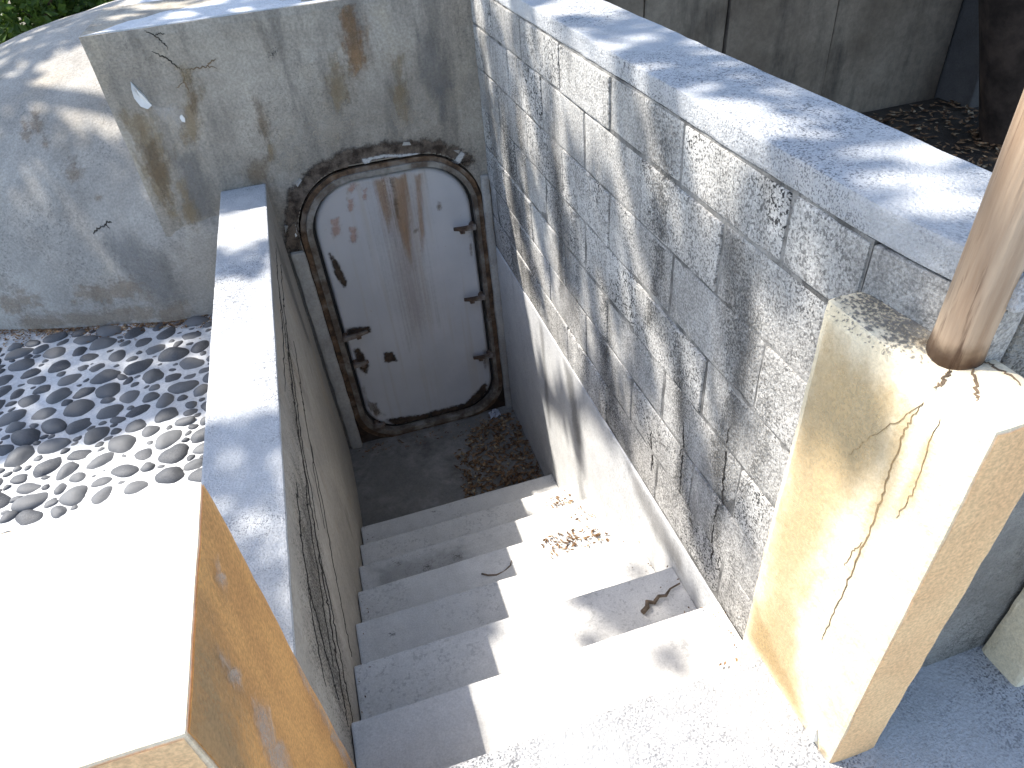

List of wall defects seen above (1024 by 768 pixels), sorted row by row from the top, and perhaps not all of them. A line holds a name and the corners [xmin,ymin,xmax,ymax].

crack [145,30,217,92]
peeling [131,82,152,109]
rust [329,253,347,287]
rust [346,326,371,335]
rust [354,348,369,374]
rust [386,384,487,425]
crack [276,255,353,727]
crack [821,362,1021,640]